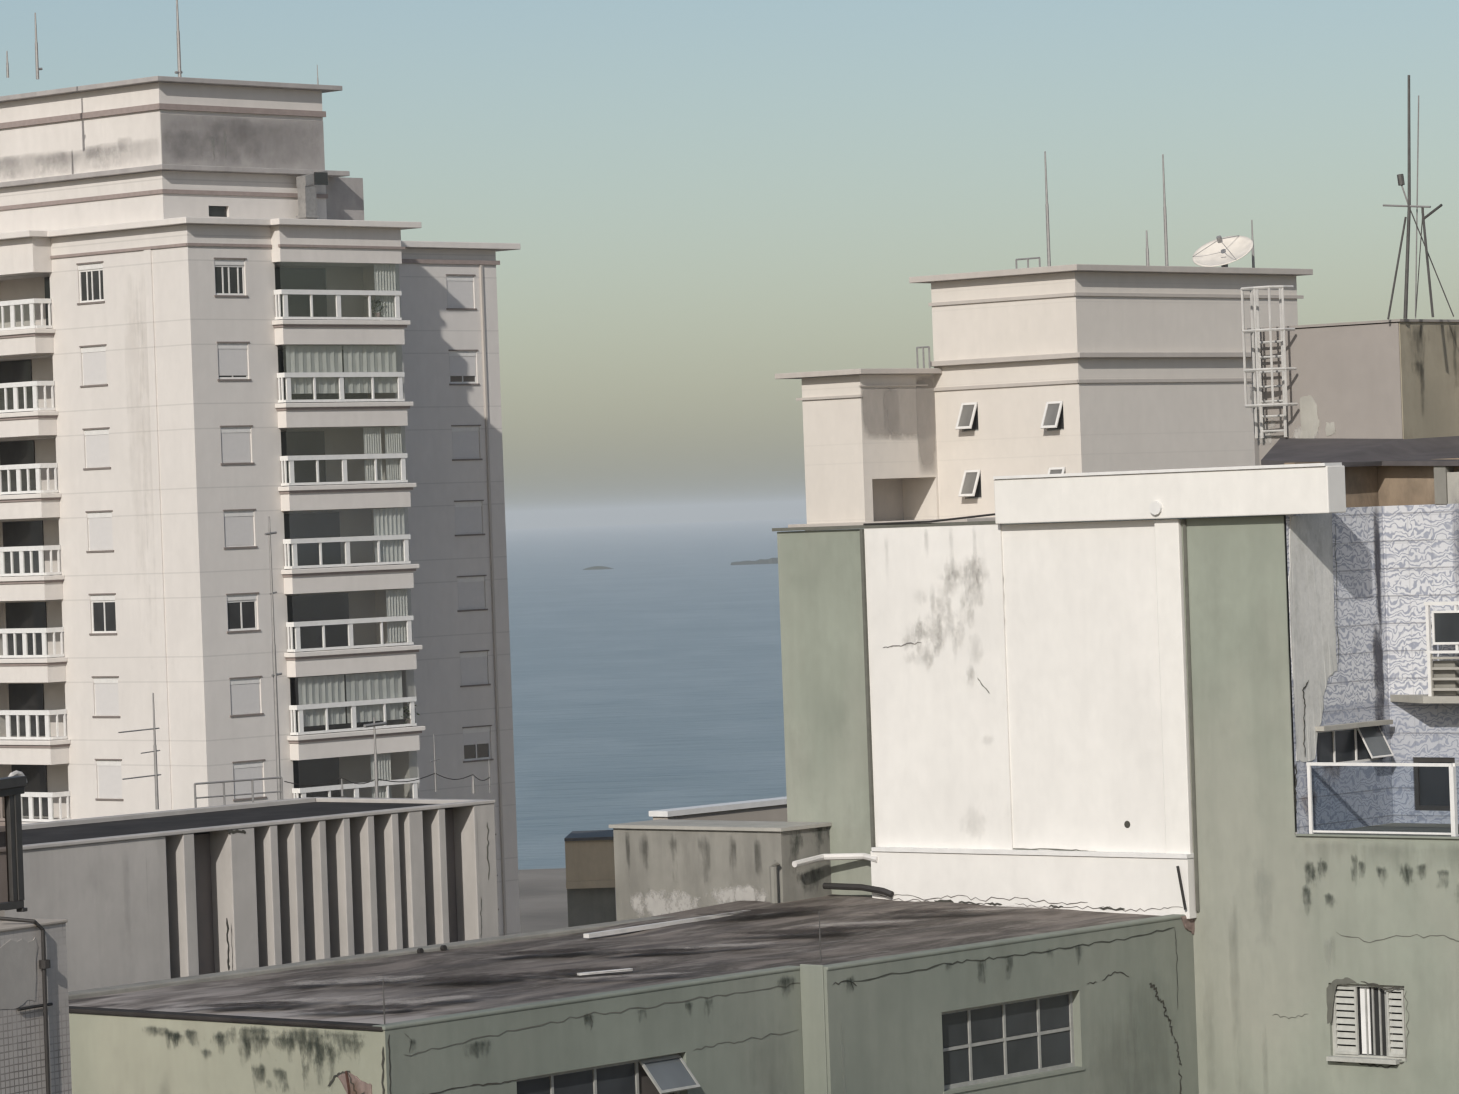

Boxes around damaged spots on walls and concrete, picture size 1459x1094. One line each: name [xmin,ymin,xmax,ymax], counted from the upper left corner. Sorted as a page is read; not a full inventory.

leakage [862,379,935,465]
leakage [178,886,1050,1012]
crack [1338,933,1459,943]
crack [381,894,1183,1094]
leakage [242,1028,332,1078]
spalling [328,1071,372,1094]